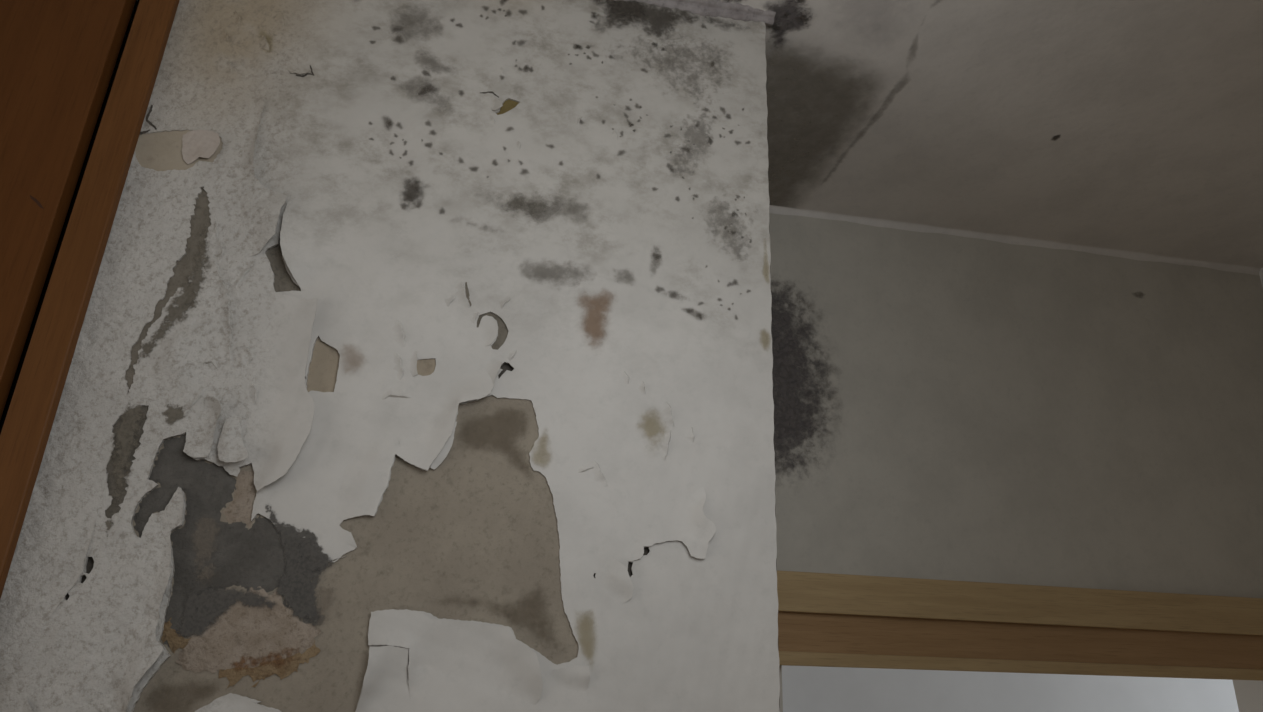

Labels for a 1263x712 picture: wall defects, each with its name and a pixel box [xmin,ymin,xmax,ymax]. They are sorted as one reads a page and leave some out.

leakage [590,0,731,50]
leakage [766,0,858,207]
leakage [369,119,422,208]
leakage [585,296,609,338]
peeling [99,96,590,712]
leakage [771,285,826,473]
peeling [594,487,716,603]